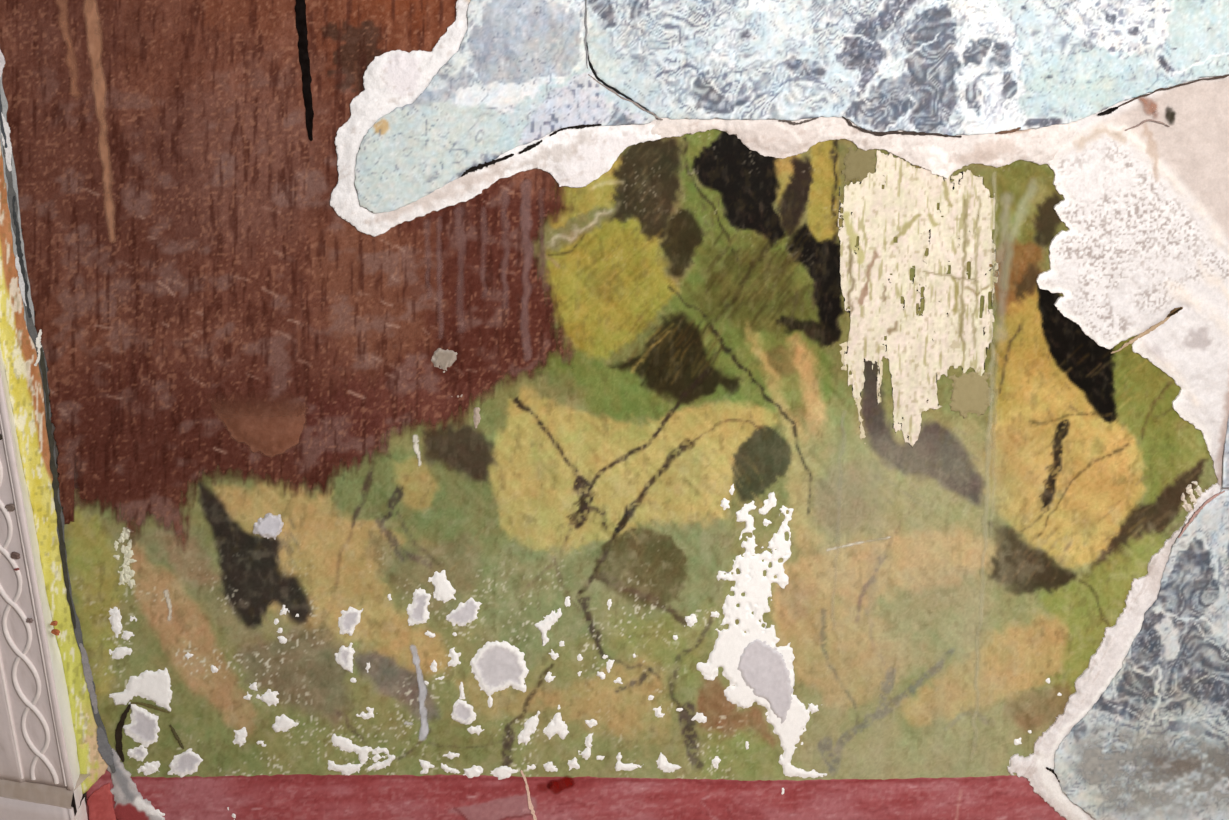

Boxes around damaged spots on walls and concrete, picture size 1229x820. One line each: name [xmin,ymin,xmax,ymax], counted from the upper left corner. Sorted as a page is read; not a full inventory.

crack [295,0,314,141]
flaking render [328,0,1229,820]
peeling [253,513,284,540]
peeling [113,527,137,589]
peeling [109,607,137,659]
peeling [274,605,299,644]
peeling [243,682,299,732]
peeling [107,668,203,820]
peeling [233,727,266,747]